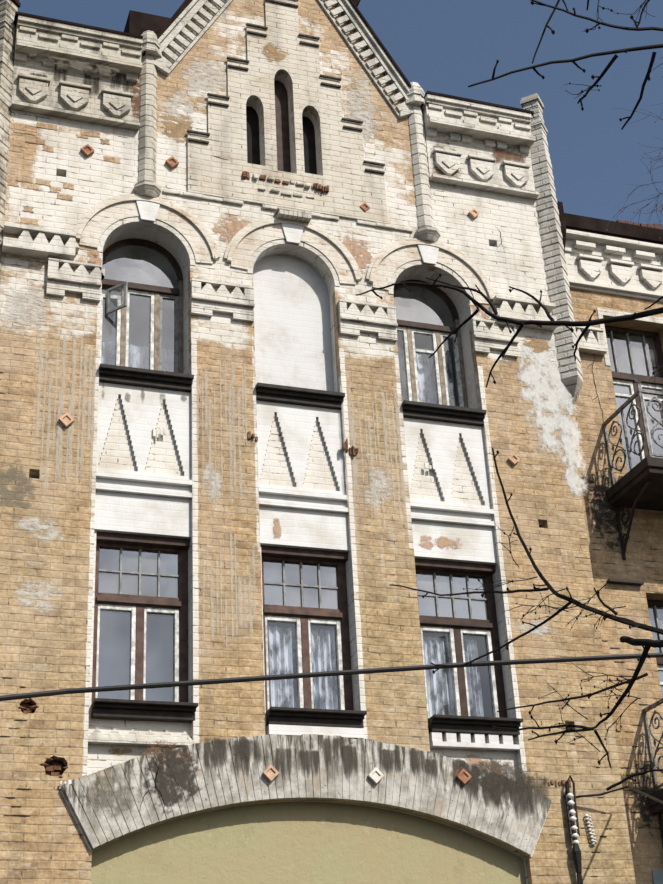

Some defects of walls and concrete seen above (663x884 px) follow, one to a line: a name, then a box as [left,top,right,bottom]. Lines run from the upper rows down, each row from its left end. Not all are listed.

peeling [9,122,58,153]
peeling [76,130,110,145]
peeling [162,112,193,142]
peeling [8,176,74,201]
peeling [273,518,281,538]
peeling [419,536,459,549]
hole [17,698,39,714]
spalling [40,758,72,785]
damp [144,738,261,812]
damp [275,738,358,776]
damp [382,749,438,776]
damp [453,757,548,814]